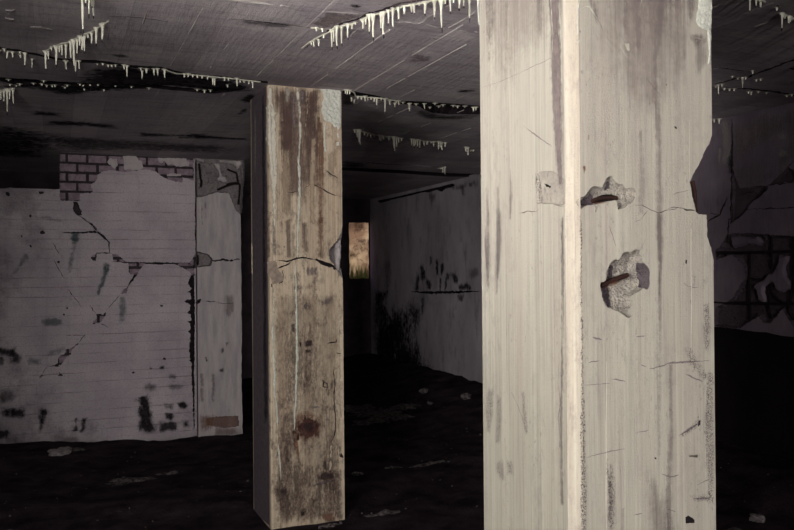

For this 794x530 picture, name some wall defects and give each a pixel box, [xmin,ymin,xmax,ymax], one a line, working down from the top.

water stain [301,0,450,49]
flaking render [59,153,245,215]
spalling [535,171,637,212]
spalling [683,181,698,213]
crack [277,257,336,281]
spalling [600,249,650,318]
spalling [714,166,794,329]
crack [63,198,239,427]
water stain [0,348,15,365]
water stain [3,408,25,418]
water stain [138,397,188,432]
corrosion [294,418,319,462]